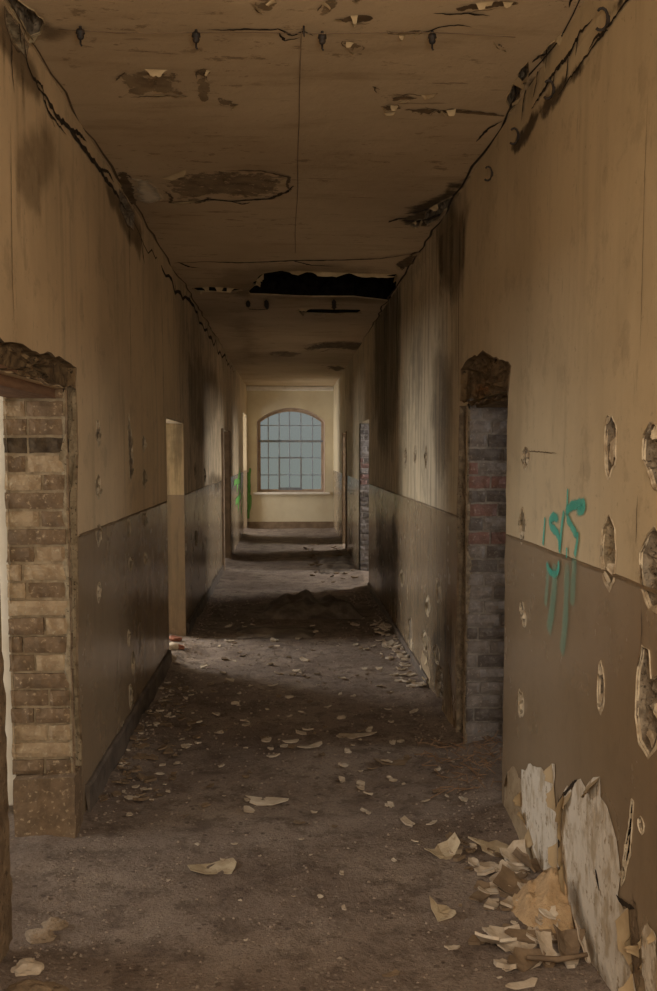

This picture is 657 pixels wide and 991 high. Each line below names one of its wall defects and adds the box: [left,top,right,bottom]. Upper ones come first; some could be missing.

peeling [116,69,238,109]
peeling [162,169,291,204]
crack [8,0,629,370]
spalling [604,415,617,481]
spalling [642,421,657,491]
spalling [0,338,82,773]
spalling [455,350,511,745]
spalling [600,515,617,592]
spalling [639,526,657,614]
spalling [408,618,444,706]
peeling [0,647,13,960]
peeling [504,763,657,991]